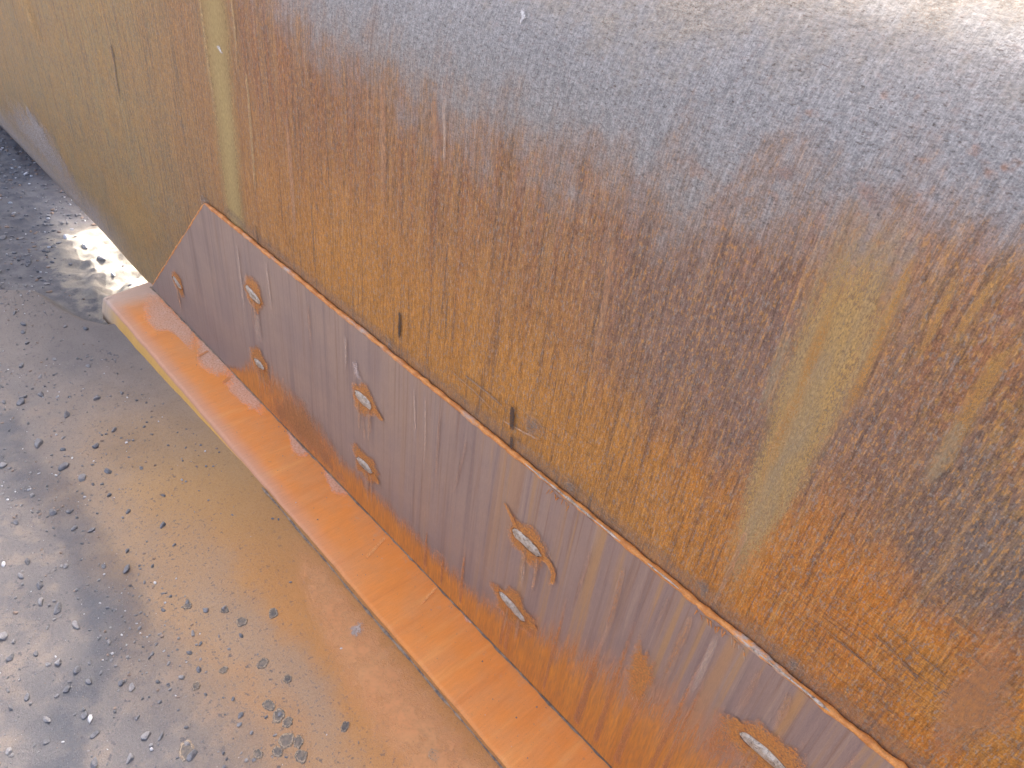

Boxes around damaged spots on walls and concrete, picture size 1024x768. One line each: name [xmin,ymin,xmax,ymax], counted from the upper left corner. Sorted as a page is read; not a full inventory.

corrosion [243,277,263,317]
corrosion [230,346,805,768]
corrosion [716,244,910,599]